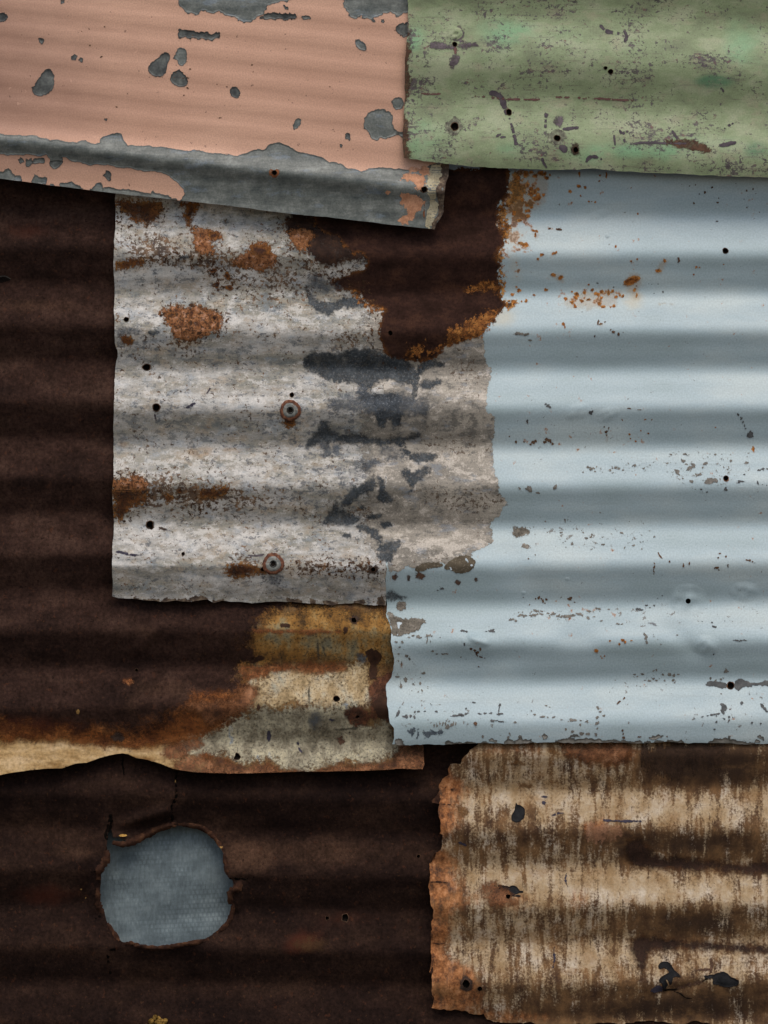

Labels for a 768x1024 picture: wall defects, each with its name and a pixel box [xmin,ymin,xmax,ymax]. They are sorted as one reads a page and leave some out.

peeling [178,0,311,23]
peeling [343,0,408,38]
peeling [148,29,220,87]
peeling [364,97,404,141]
peeling [0,133,444,229]
rust [114,167,562,370]
rust [112,463,231,529]
peeling [582,453,768,493]
rust [0,600,424,782]
rust [559,742,725,780]
rust [586,824,768,876]
rust [630,935,768,972]